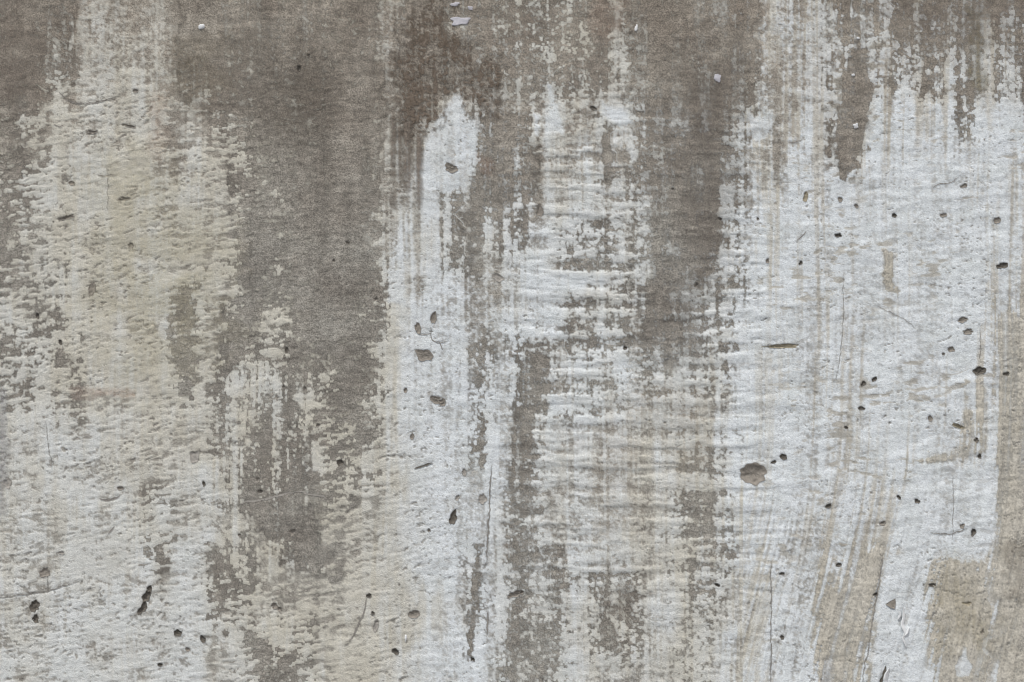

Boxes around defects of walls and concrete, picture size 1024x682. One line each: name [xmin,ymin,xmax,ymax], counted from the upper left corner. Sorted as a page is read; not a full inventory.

leakage [967,9,984,90]